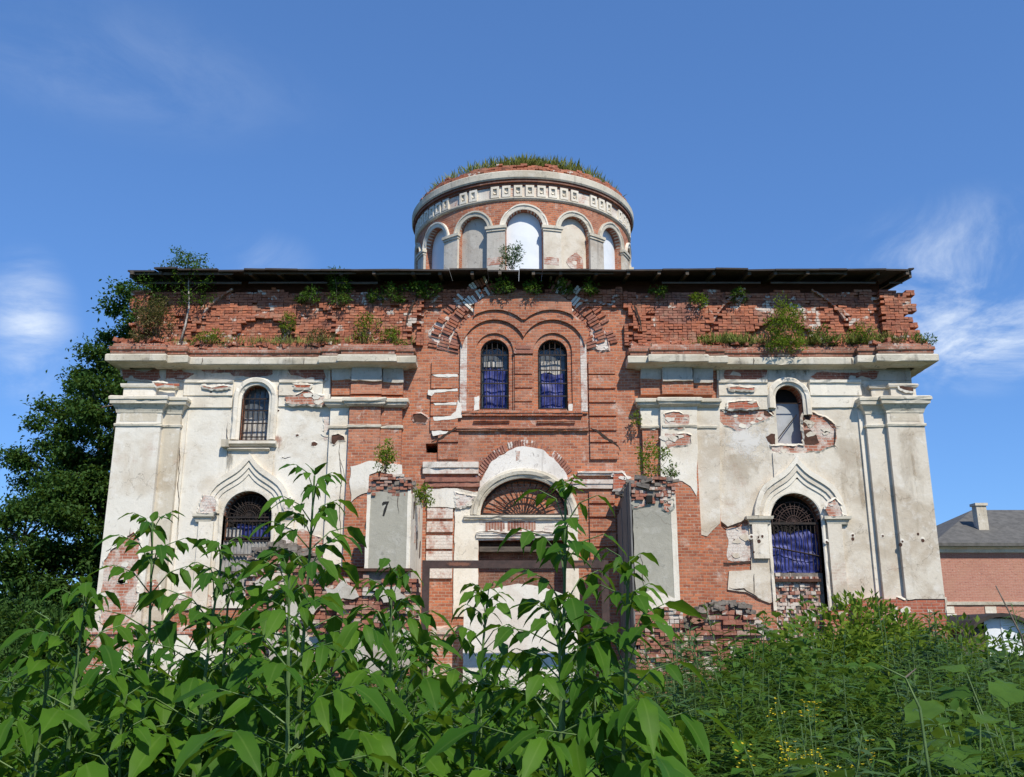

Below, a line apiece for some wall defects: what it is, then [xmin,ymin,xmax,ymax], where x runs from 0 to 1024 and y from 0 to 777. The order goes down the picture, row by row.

peeling [277,369,346,448]
peeling [659,410,693,448]
peeling [720,369,774,432]
peeling [766,410,837,455]
peeling [726,525,765,561]
peeling [99,530,161,625]
spalling [690,609,709,624]